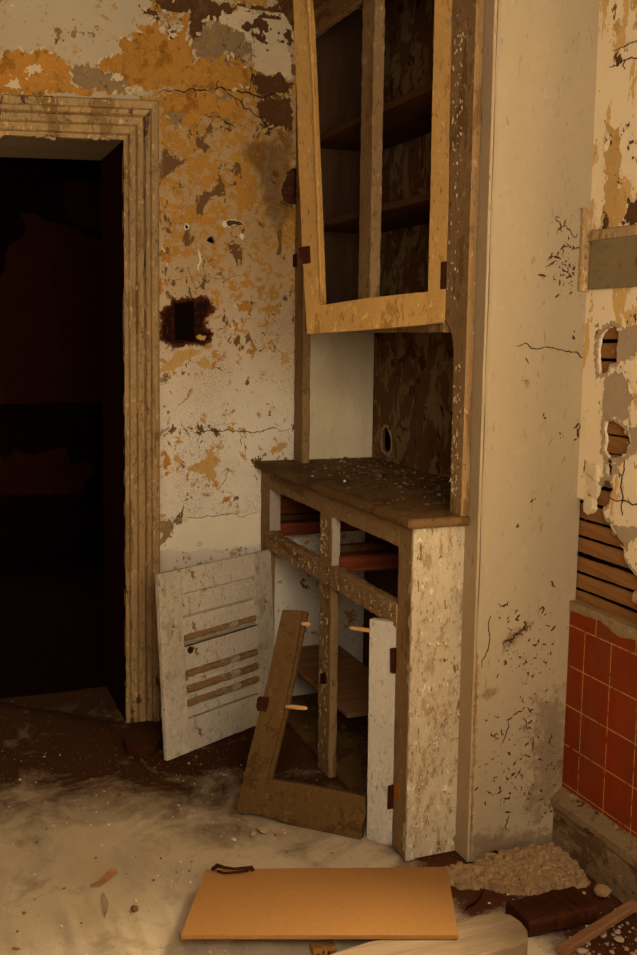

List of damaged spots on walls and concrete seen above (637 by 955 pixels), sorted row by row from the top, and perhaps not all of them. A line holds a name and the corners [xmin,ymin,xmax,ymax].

peeling [0,0,296,144]